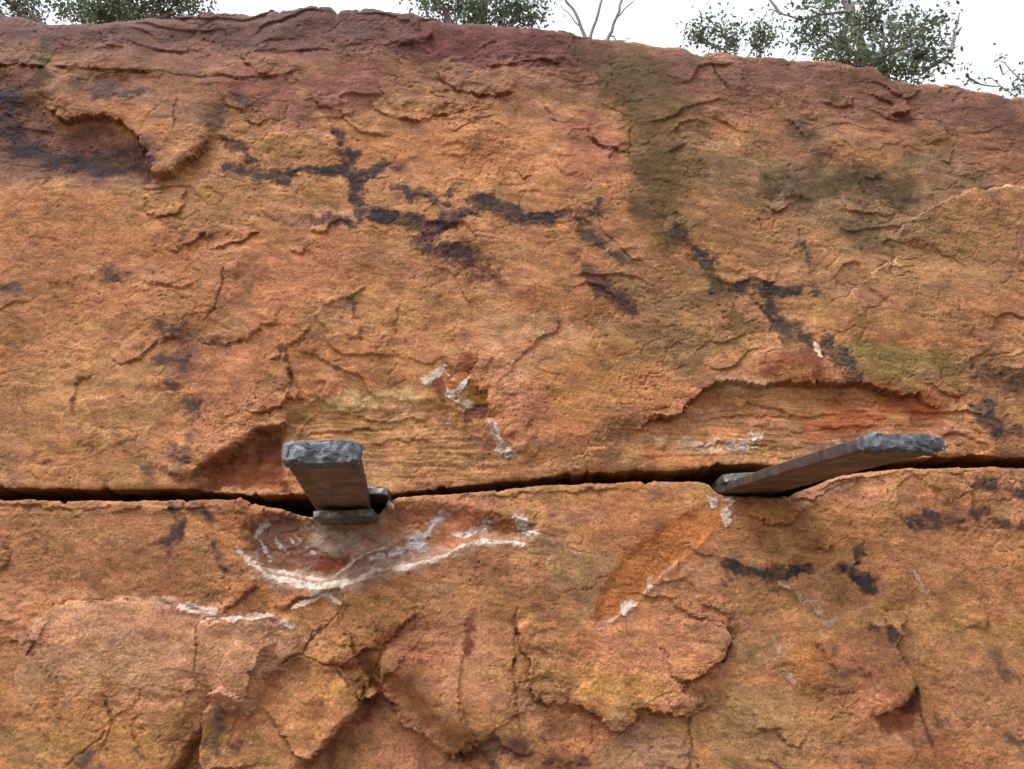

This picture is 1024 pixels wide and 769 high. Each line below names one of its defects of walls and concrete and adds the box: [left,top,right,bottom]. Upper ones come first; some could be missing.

leakage [0,89,154,181]
leakage [199,95,638,316]
leakage [572,45,863,386]
leakage [762,118,918,213]
leakage [900,505,987,532]
leakage [970,476,997,489]
leakage [722,559,812,583]
leakage [837,543,880,595]